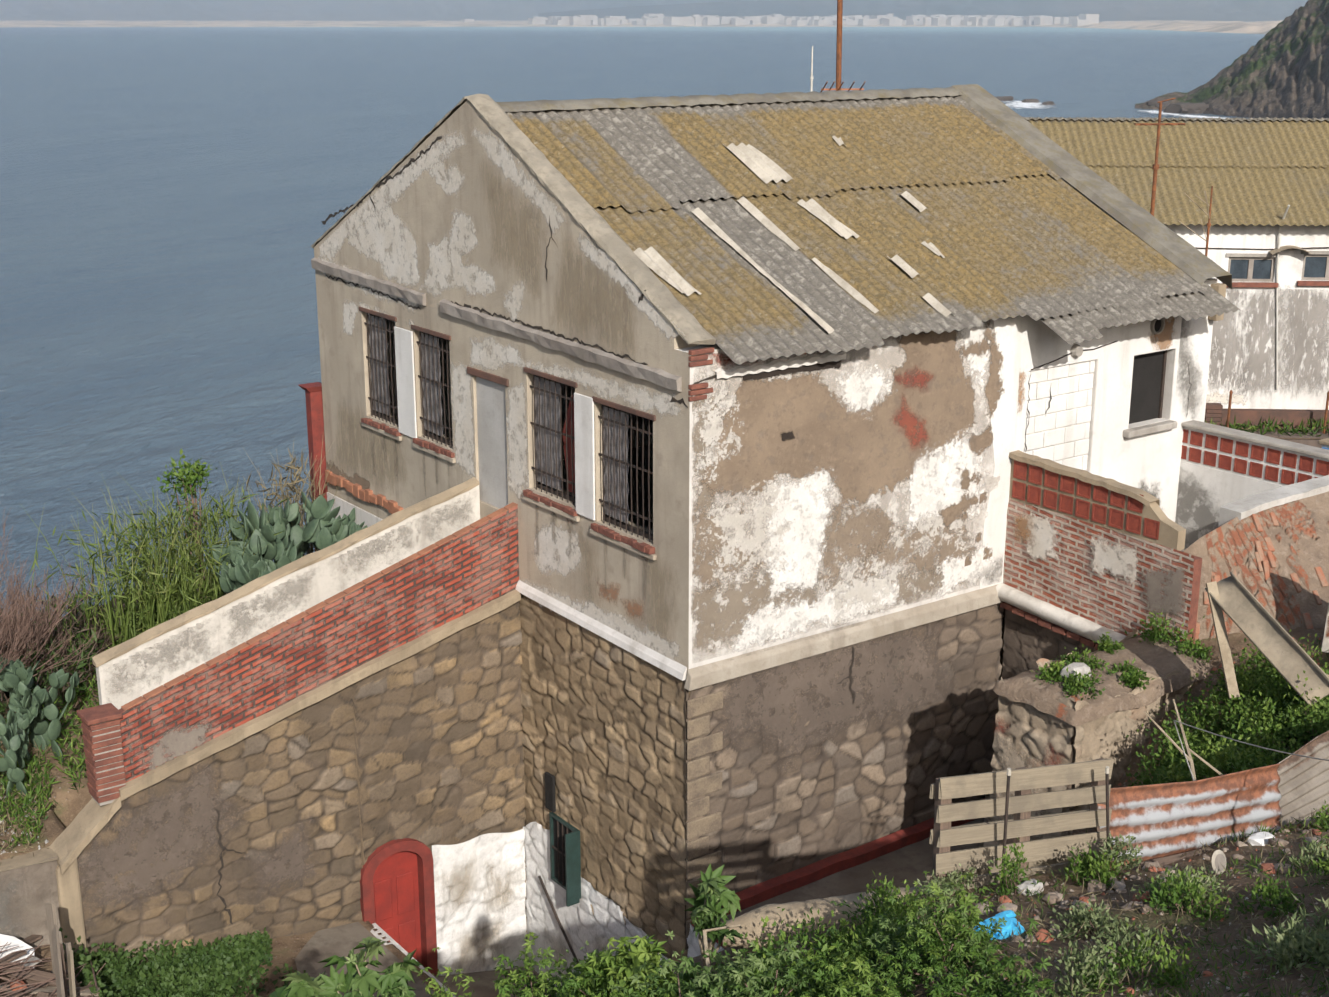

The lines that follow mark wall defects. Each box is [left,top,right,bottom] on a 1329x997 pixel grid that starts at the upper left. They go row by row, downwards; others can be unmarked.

peeling [319,129,564,335]
spalling [325,461,403,514]
flaking render [451,234,1004,661]
water stain [1151,289,1329,411]